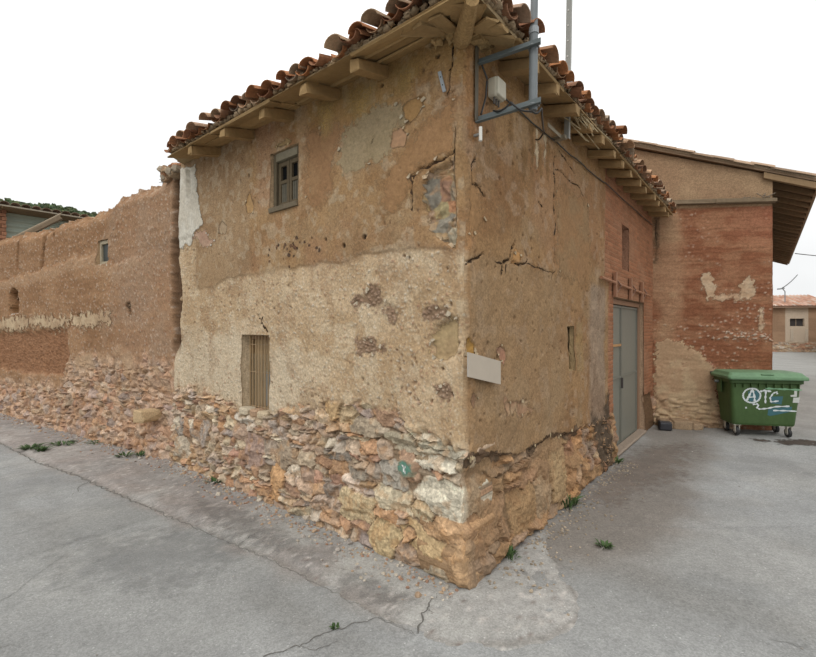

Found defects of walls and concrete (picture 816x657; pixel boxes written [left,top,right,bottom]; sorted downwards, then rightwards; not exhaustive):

flaking render [336,95,409,176]
flaking render [178,164,216,248]
spalling [410,154,457,248]
crack [538,151,583,235]
crack [465,246,555,278]
flaking render [700,272,756,302]
spalling [708,307,774,342]
flaking render [652,338,722,428]